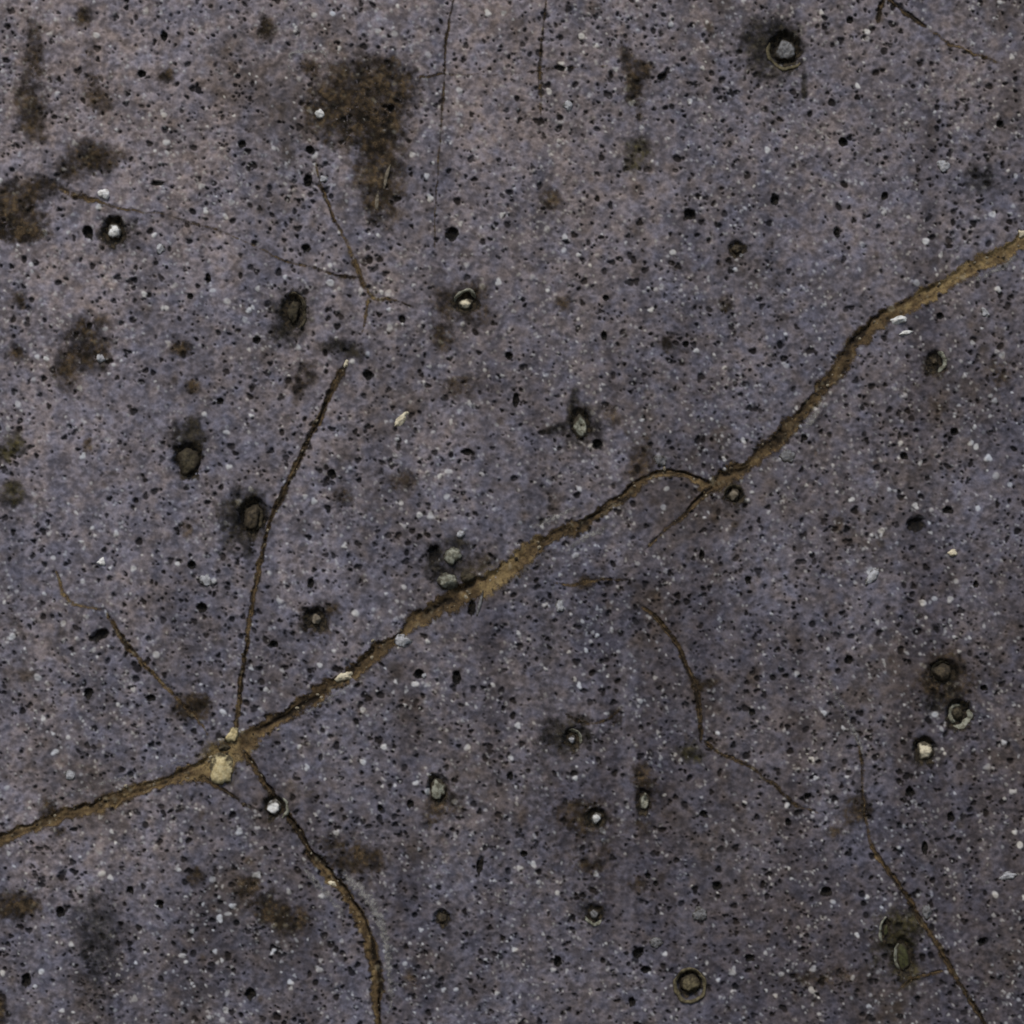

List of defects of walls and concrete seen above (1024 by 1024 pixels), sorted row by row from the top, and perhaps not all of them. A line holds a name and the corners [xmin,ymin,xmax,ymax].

leakage [302,55,420,225]
crack [61,164,411,332]
crack [0,232,1024,1024]